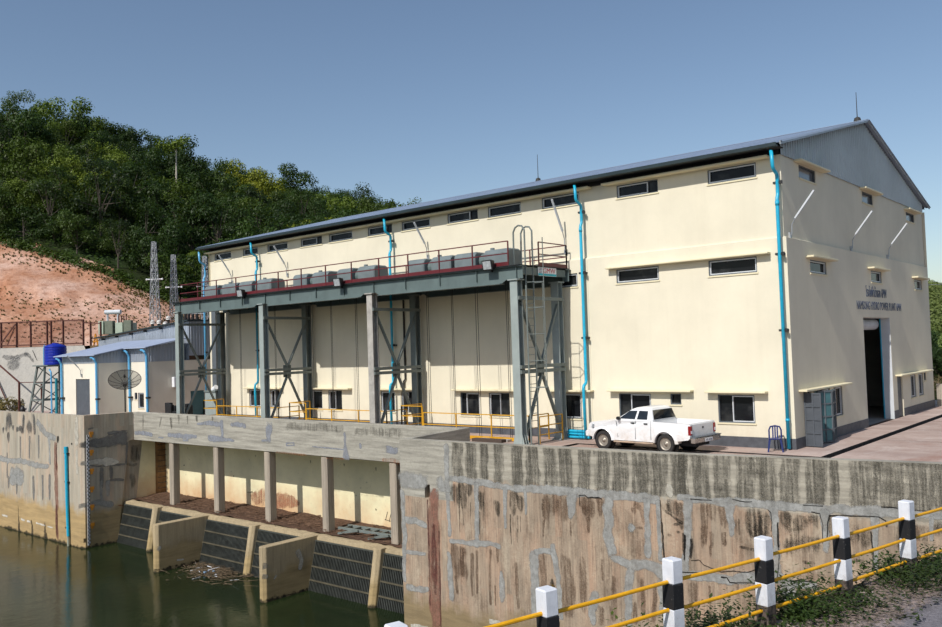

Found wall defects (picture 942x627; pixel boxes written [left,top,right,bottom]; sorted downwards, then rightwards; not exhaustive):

corrosion [251,489,298,509]
damp [450,443,942,554]
corrosion [427,488,442,627]
damp [451,543,498,605]
damp [539,558,587,614]
crack [660,499,817,592]
crack [803,505,926,568]